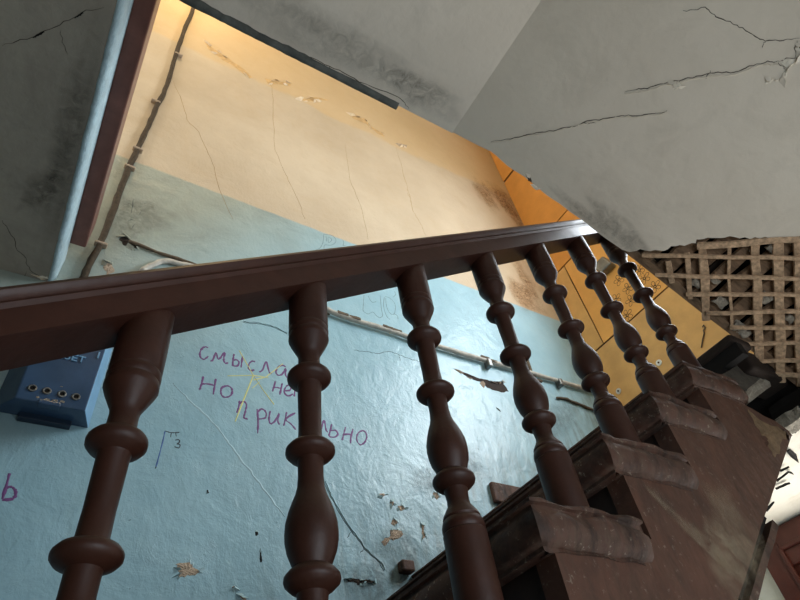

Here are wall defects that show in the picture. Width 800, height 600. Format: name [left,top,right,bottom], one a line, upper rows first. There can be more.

crack [4,8,101,53]
crack [626,7,796,94]
crack [492,112,665,143]
flaking render [641,236,800,457]
spalling [455,369,509,393]
crack [324,481,385,570]
spalling [377,493,408,546]